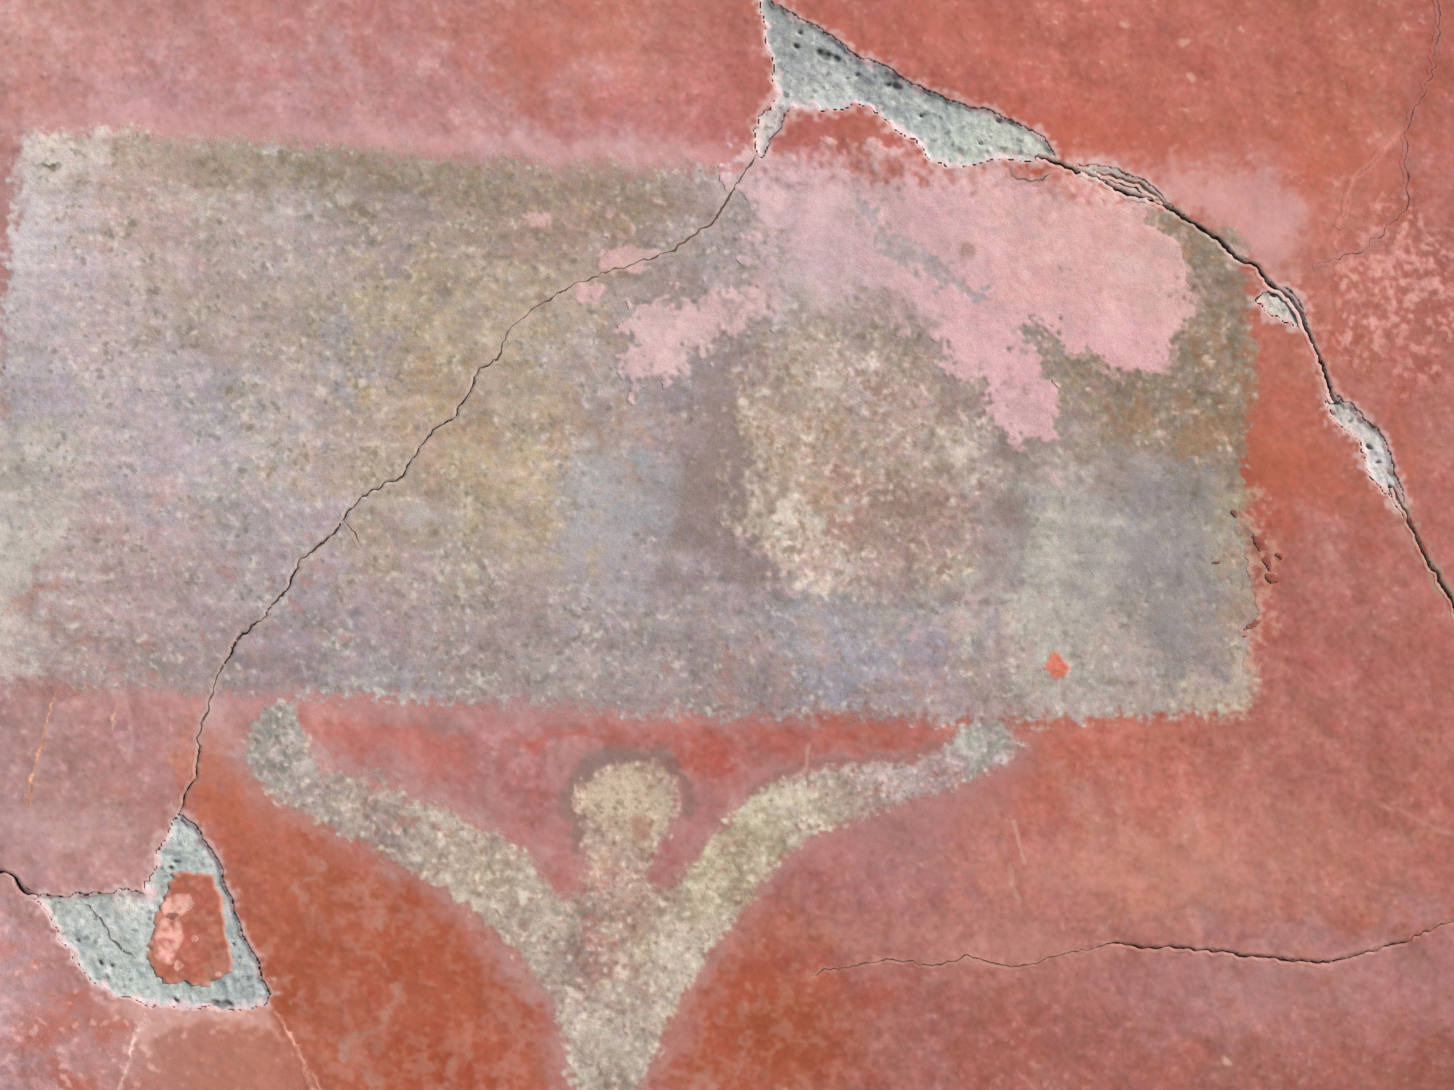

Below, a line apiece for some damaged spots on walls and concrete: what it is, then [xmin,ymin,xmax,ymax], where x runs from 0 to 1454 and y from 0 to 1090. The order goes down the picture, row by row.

peeling [615,0,1196,456]
crack [1035,0,1445,404]
peeling [1256,179,1454,401]
crack [175,151,761,815]
spalling [1326,395,1404,505]
crack [1390,486,1454,622]
crack [23,692,58,812]
crack [0,867,39,899]
spalling [33,814,269,1011]
crack [808,918,1454,980]